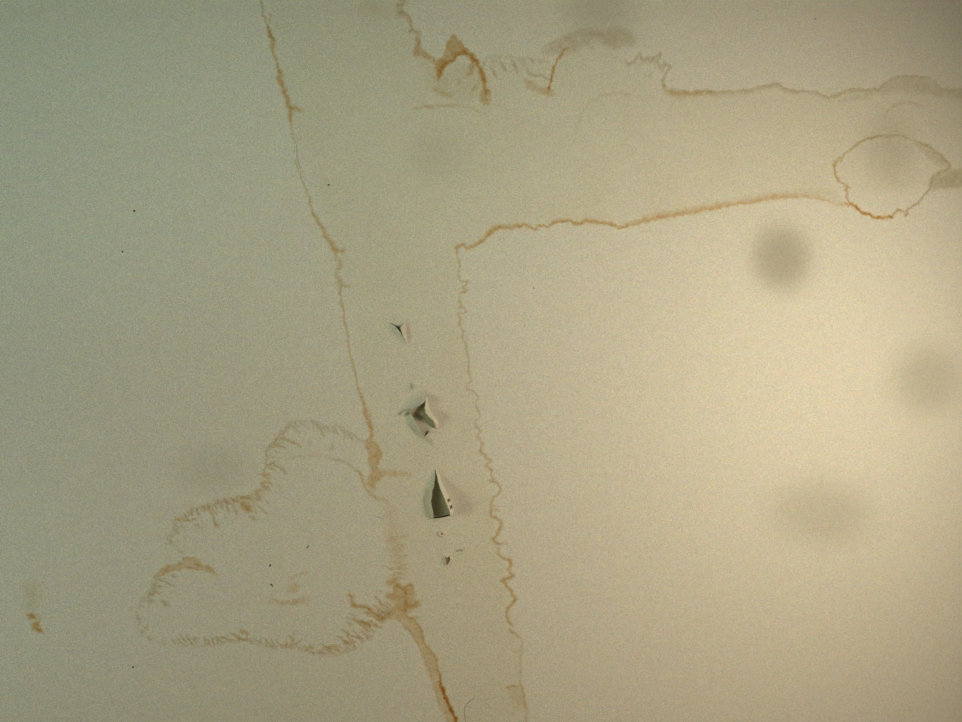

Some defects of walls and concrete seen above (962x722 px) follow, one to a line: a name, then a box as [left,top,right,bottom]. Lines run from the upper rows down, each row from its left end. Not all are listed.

water stain [126,0,460,722]
peeling [398,382,439,448]
peeling [417,463,454,524]
water stain [453,0,962,722]